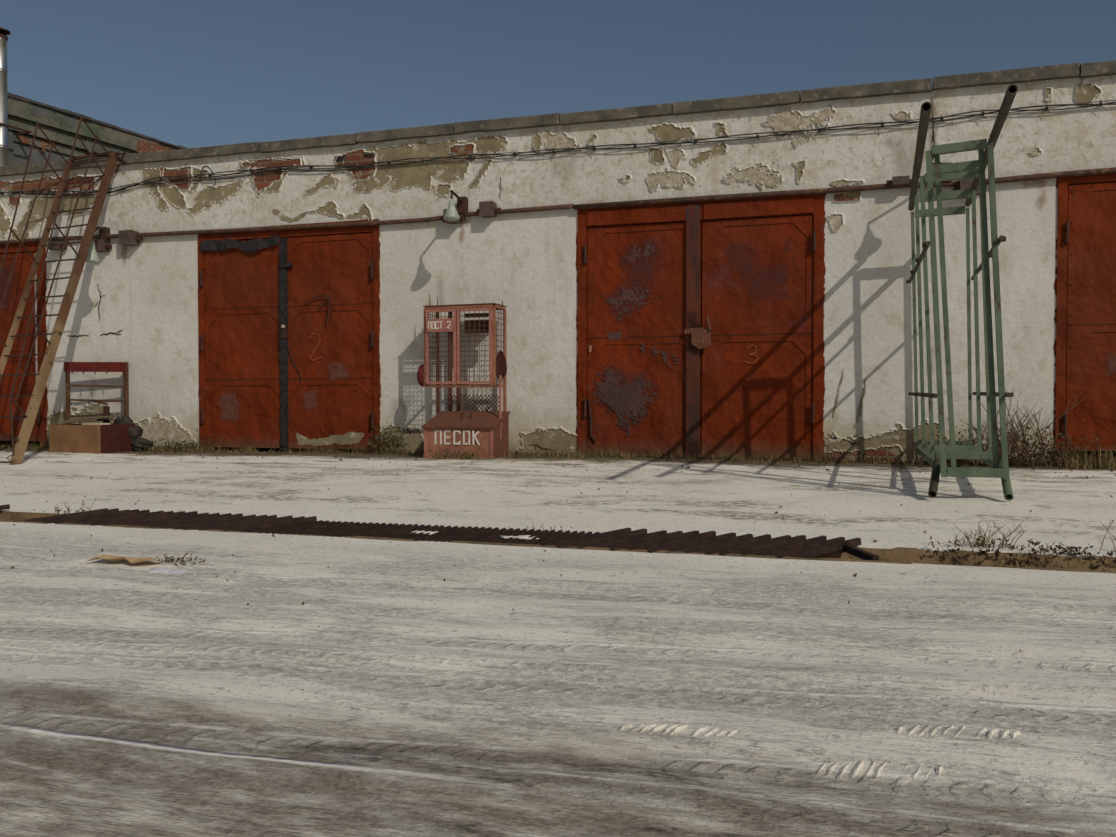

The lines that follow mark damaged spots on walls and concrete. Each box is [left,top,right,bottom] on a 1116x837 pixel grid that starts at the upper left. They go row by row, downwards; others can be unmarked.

peeling [0,174,98,240]
peeling [141,155,307,217]
peeling [272,134,510,222]
peeling [531,129,599,154]
peeling [618,104,837,194]
flaking render [825,178,865,234]
peeling [599,236,667,341]
peeling [587,343,684,437]
peeling [296,431,364,447]
peeling [381,424,424,454]